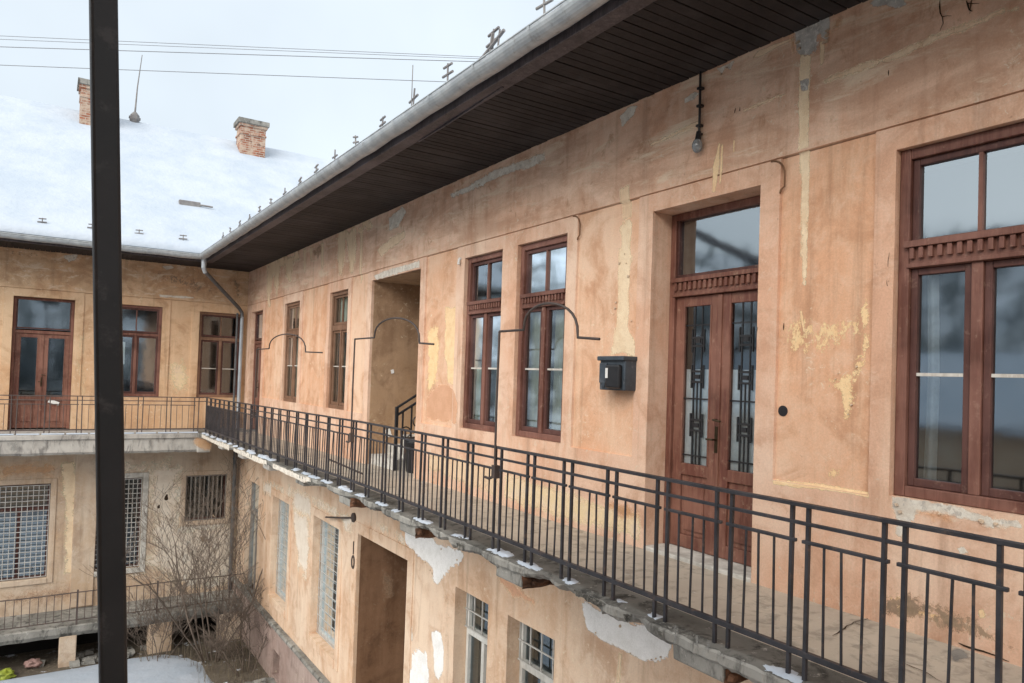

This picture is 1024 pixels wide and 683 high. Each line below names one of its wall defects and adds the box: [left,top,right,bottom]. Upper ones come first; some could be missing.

peeling [754,17,830,57]
peeling [612,220,635,356]
peeling [829,299,870,420]
peeling [892,497,1022,537]
peeling [405,528,464,585]
peeling [574,590,672,662]
peeling [409,627,444,683]